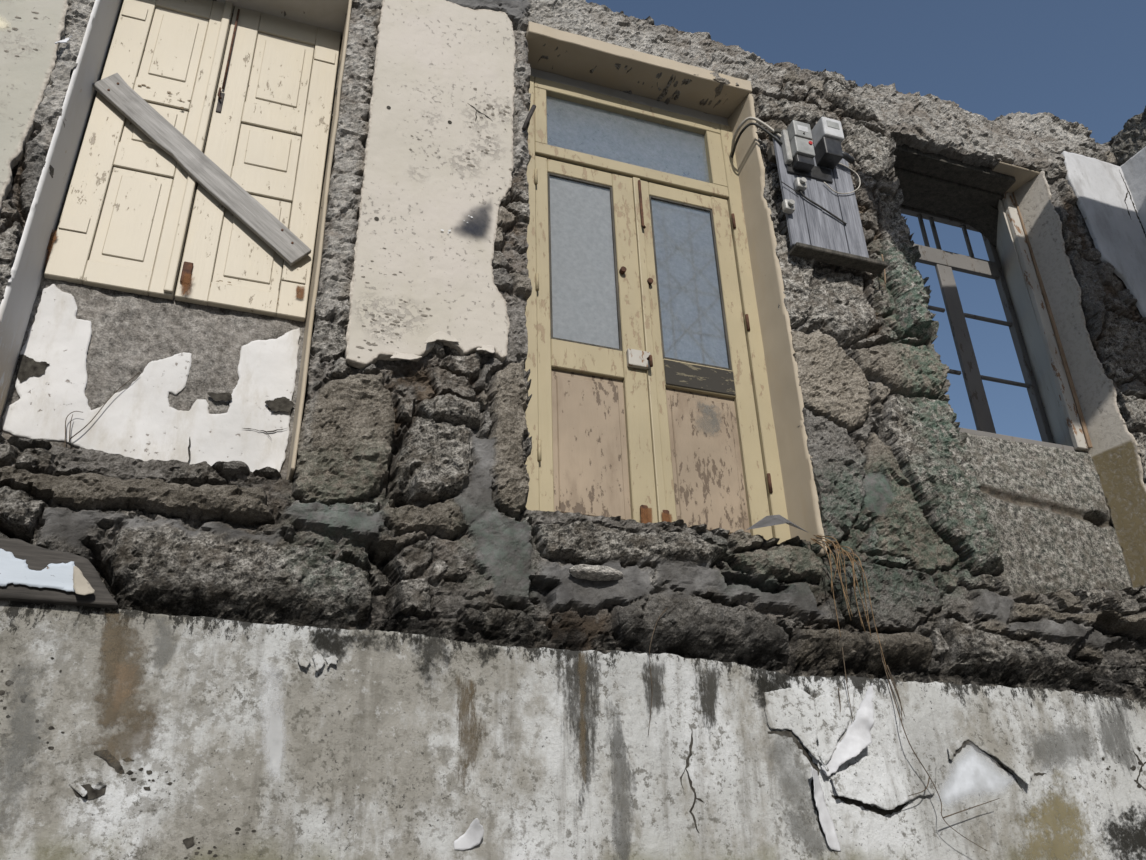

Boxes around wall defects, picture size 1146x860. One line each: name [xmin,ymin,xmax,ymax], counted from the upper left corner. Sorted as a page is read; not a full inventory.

spalling [16,354,50,382]
spalling [208,392,232,402]
spalling [265,397,295,412]
water stain [311,627,450,682]
water stain [642,664,665,714]
water stain [696,669,720,728]
water stain [557,653,599,806]
crack [680,731,703,833]
peeling [764,683,1034,856]
water stain [1022,706,1135,860]
peeling [454,818,484,851]
water stain [1103,806,1146,860]